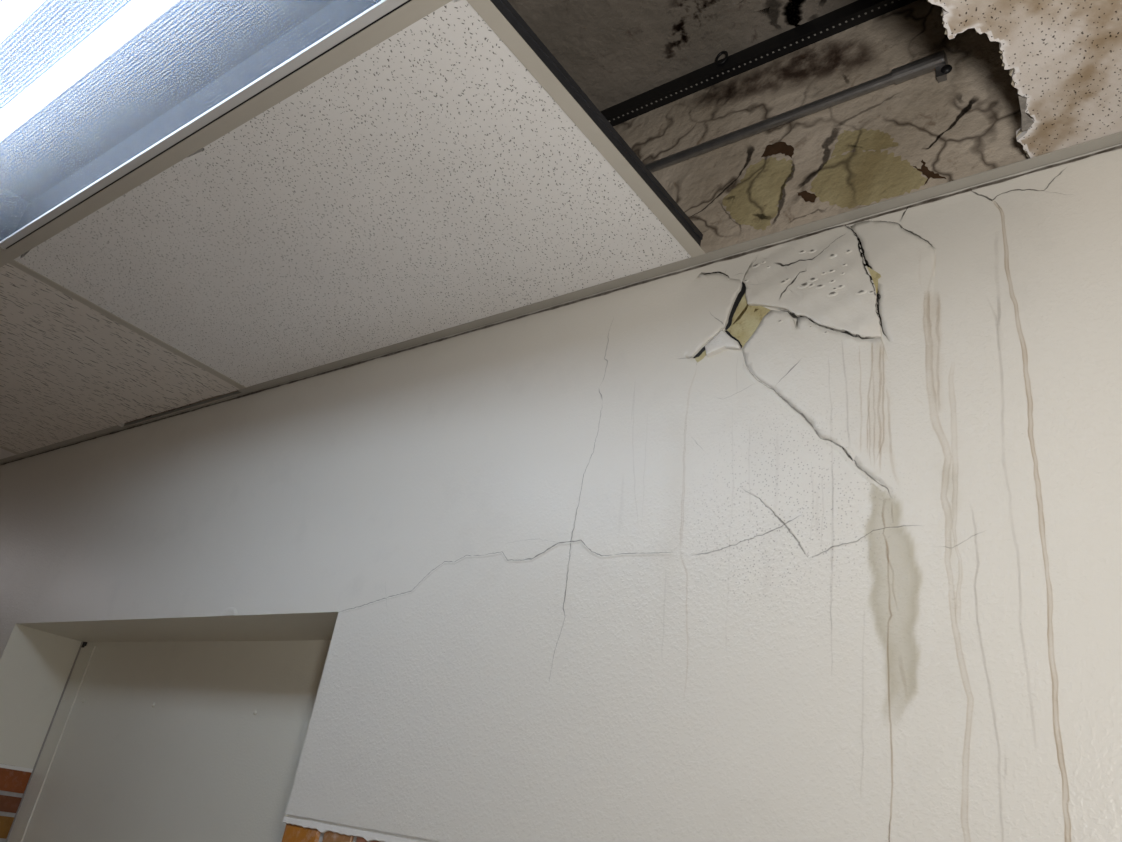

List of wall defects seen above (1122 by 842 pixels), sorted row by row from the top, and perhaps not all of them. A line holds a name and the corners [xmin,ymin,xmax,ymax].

peeling [668,0,715,58]
peeling [722,128,946,231]
spalling [675,273,770,363]
crack [778,209,932,339]
crack [741,486,808,557]
crack [340,540,673,613]